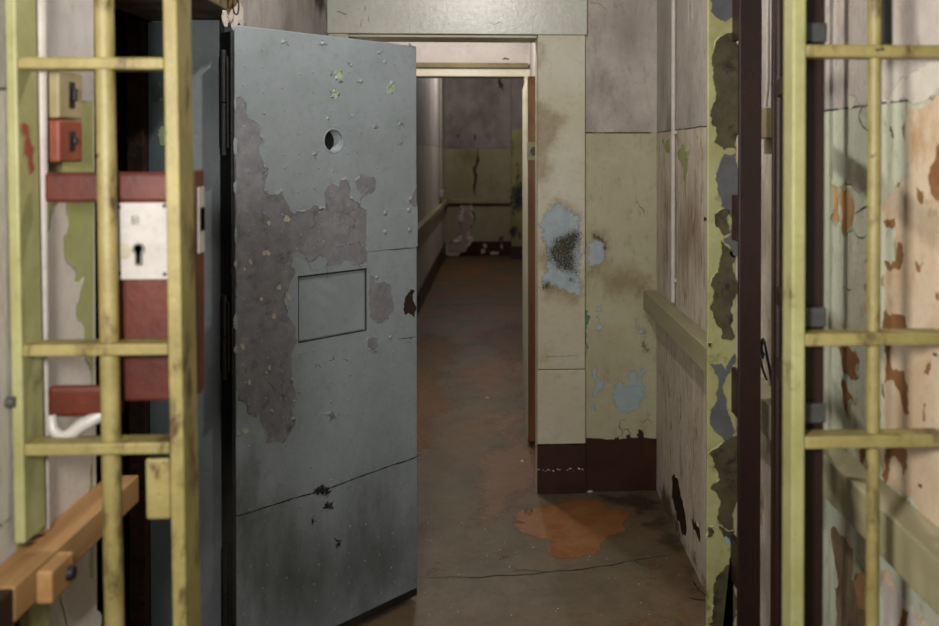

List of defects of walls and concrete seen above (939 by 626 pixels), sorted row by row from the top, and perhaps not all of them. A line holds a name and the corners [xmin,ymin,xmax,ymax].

spalling [48,203,85,339]
peeling [233,97,377,443]
crack [457,134,480,223]
peeling [538,203,605,296]
peeling [704,0,738,347]
spalling [881,92,939,330]
spalling [837,346,860,421]
spalling [881,345,939,430]
peeling [671,353,737,626]
spalling [880,447,939,528]
spalling [49,549,102,626]
spalling [831,526,866,626]